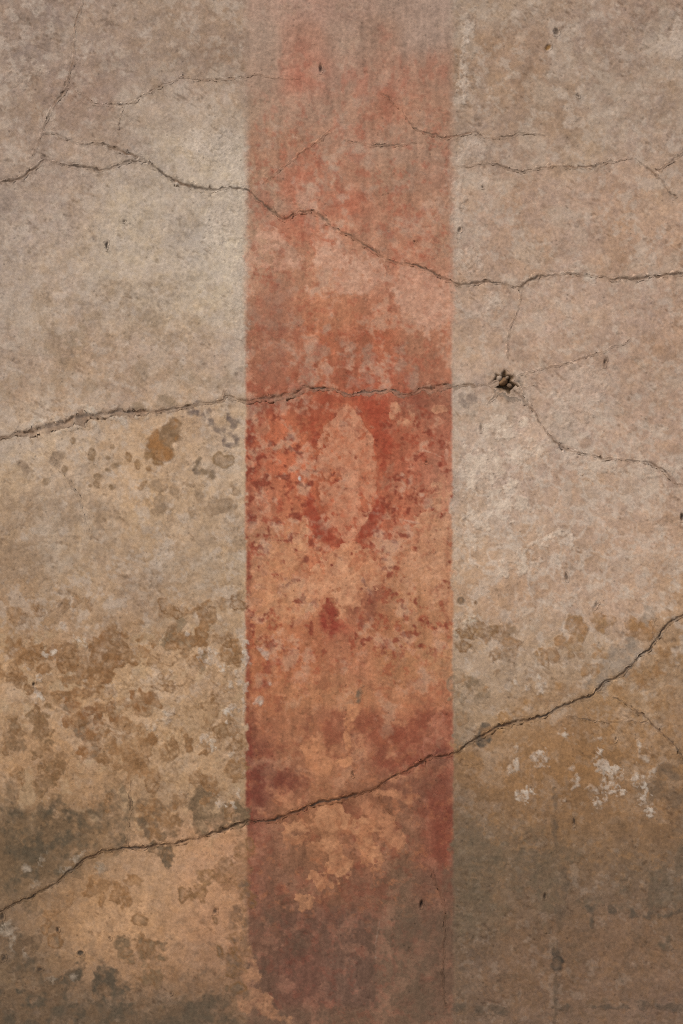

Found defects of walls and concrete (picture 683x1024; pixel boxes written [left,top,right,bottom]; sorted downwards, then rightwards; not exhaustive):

water stain [42,272,193,372]
crack [0,0,683,532]
water stain [0,361,243,591]
water stain [0,590,272,1024]
crack [0,610,683,915]
water stain [439,736,683,1024]